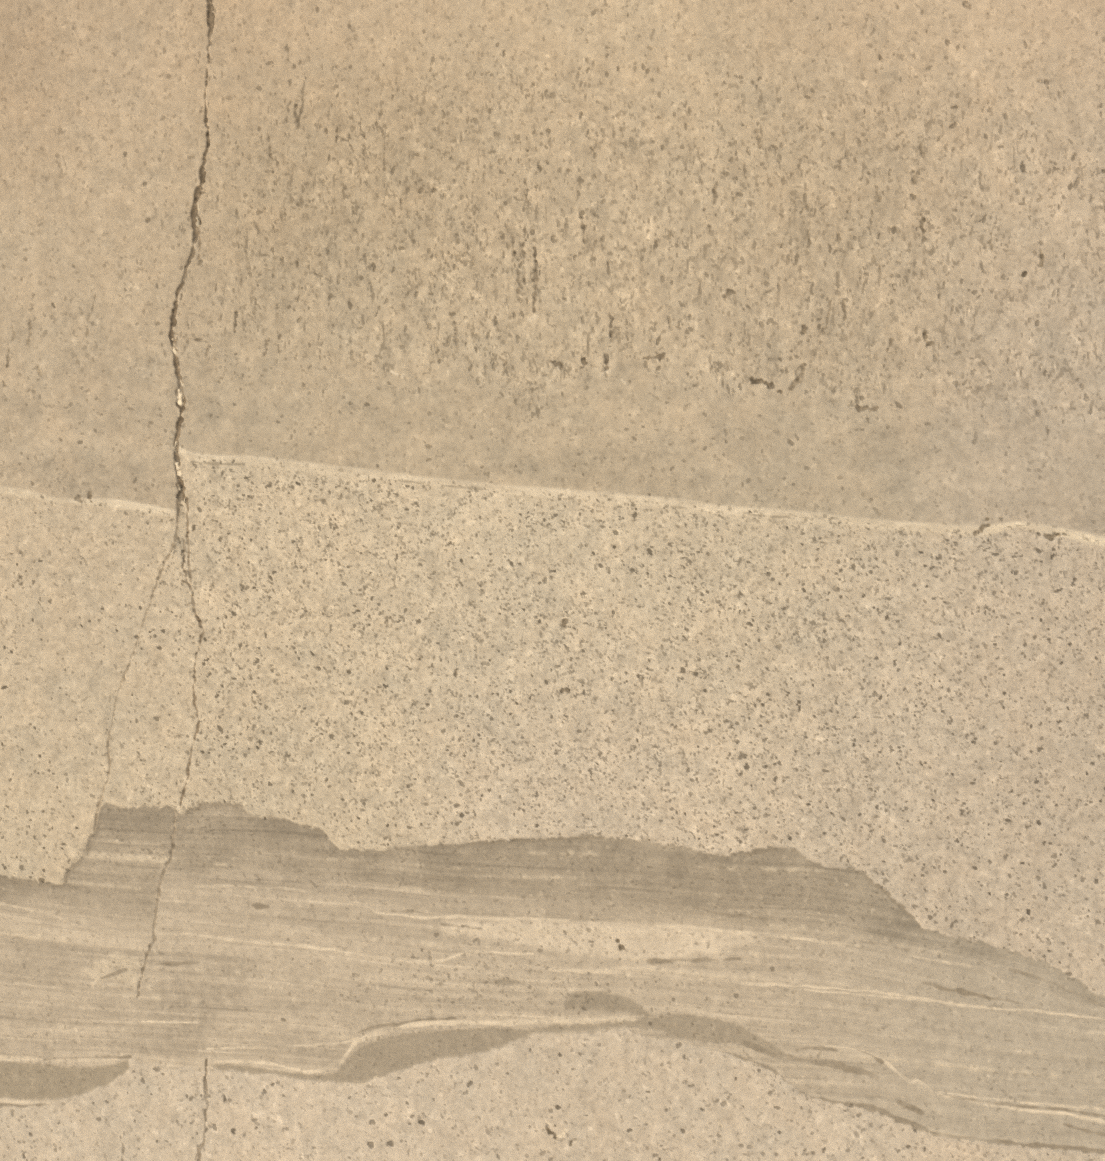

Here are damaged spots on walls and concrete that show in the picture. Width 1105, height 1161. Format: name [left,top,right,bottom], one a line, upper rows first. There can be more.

crack [94,0,216,999]
crack [196,1059,210,1161]